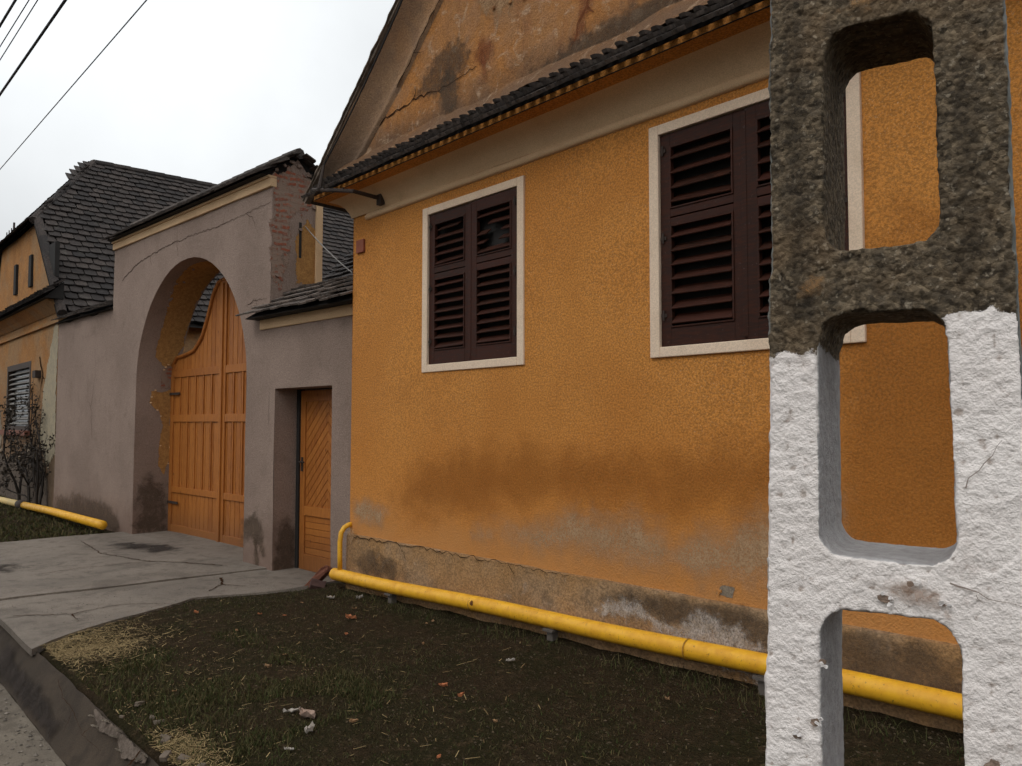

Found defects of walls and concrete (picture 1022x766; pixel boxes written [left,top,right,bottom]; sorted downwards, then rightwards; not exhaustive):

crack [379,0,476,126]
damp [544,0,683,67]
flaking render [268,160,316,291]
peeling [155,261,219,389]
damp [678,525,769,573]
damp [595,593,769,651]
damp [842,633,962,694]